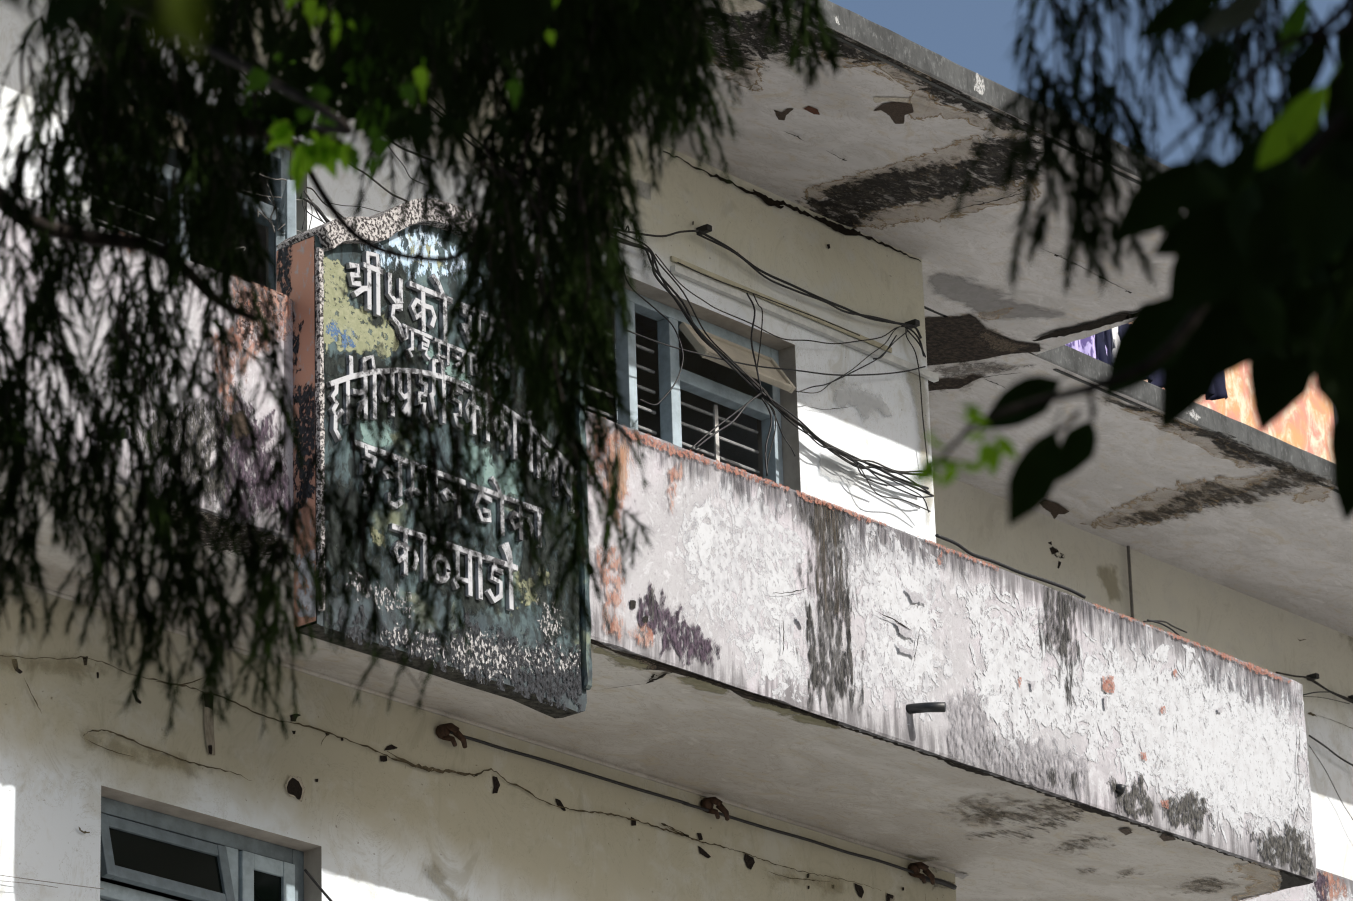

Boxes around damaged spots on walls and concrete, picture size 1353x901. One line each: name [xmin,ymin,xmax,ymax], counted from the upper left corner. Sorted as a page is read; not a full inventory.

peeling [774,106,820,120]
peeling [873,97,914,124]
spalling [925,308,1043,391]
water stain [135,245,1334,901]
peeling [346,426,1315,861]
crack [0,655,881,891]
flaking render [744,854,755,870]